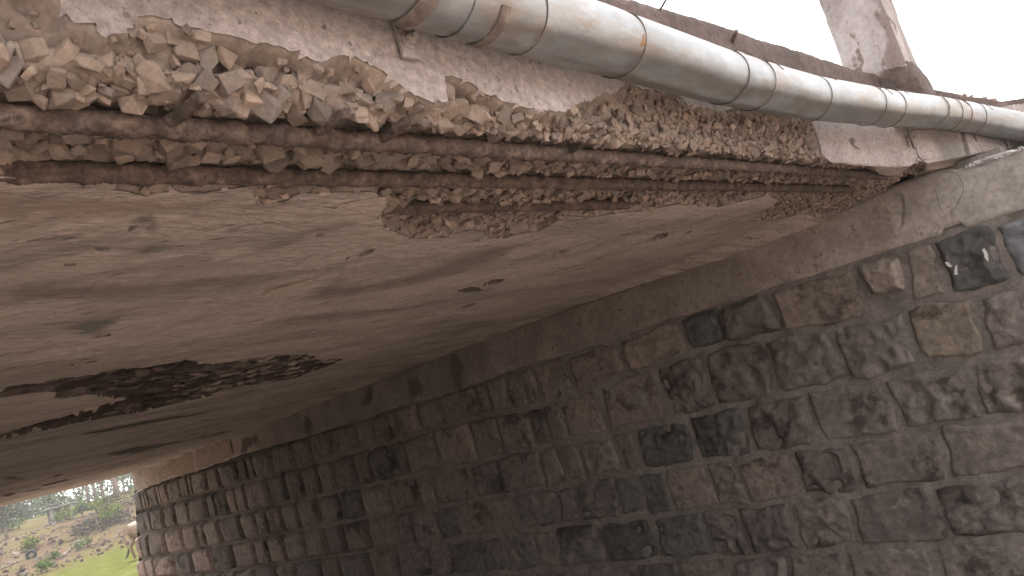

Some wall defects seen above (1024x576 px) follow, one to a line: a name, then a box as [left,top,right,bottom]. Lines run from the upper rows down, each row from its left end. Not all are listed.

spalling [0,0,929,239]
spalling [0,354,342,439]